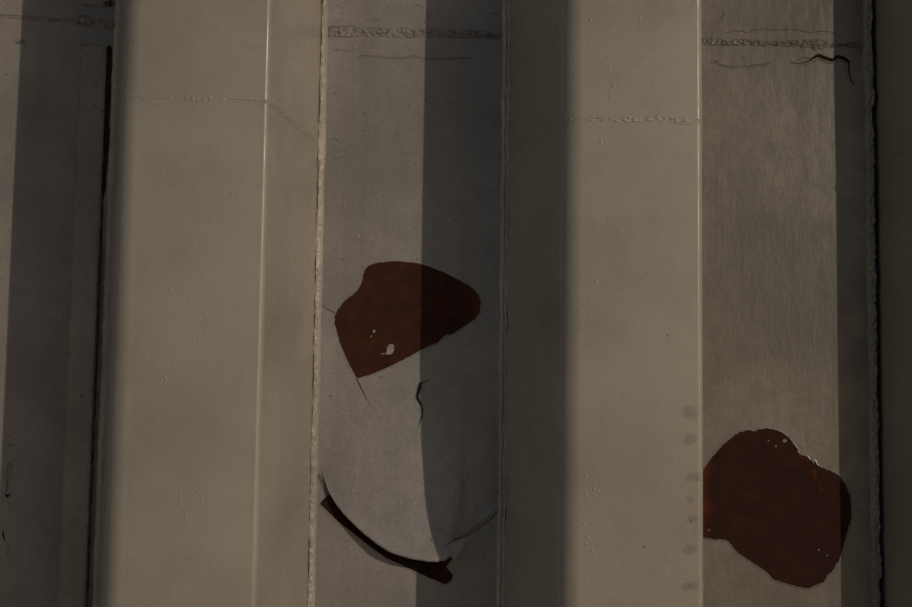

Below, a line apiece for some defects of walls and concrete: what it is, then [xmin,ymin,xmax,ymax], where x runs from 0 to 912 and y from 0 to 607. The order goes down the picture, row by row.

crack [710,54,855,87]
crack [417,380,428,425]